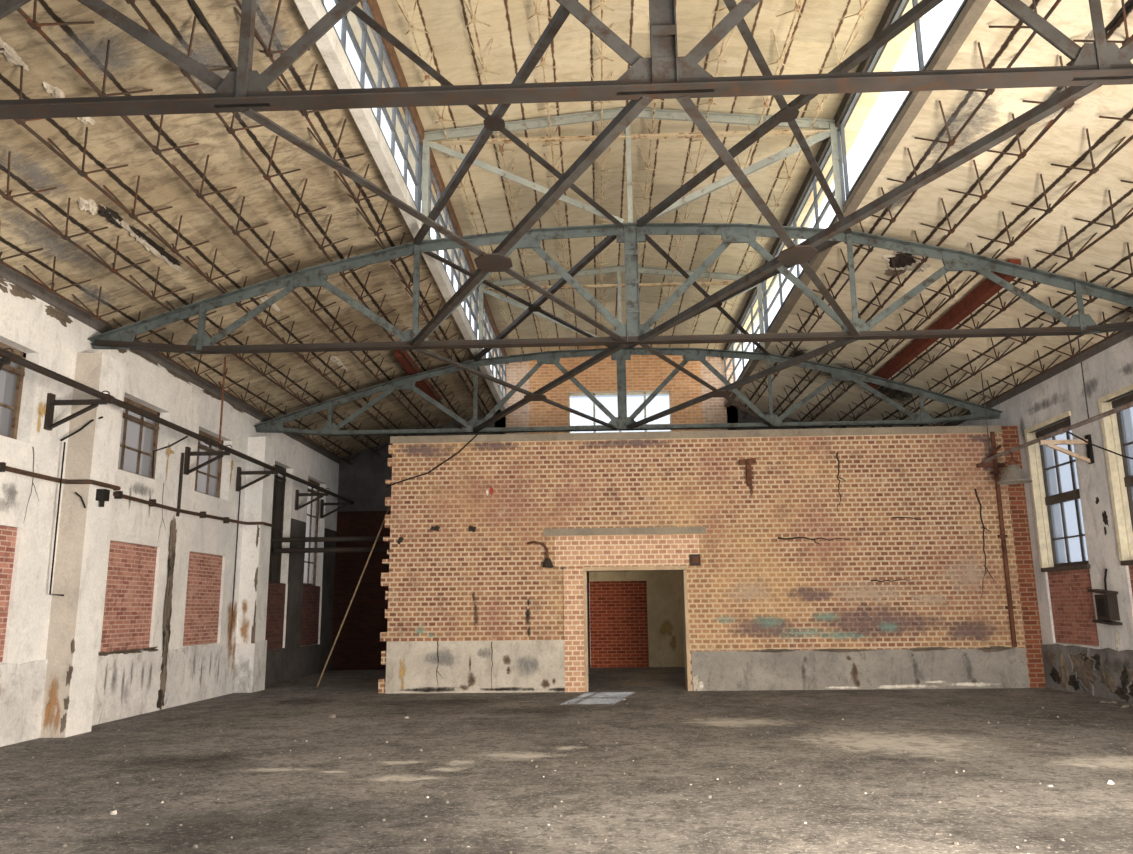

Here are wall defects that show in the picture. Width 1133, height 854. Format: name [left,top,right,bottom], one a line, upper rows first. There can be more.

crack [974,489,994,598]
rust [228,603,249,668]
rust [44,683,60,727]
spalling [1044,648,1133,702]